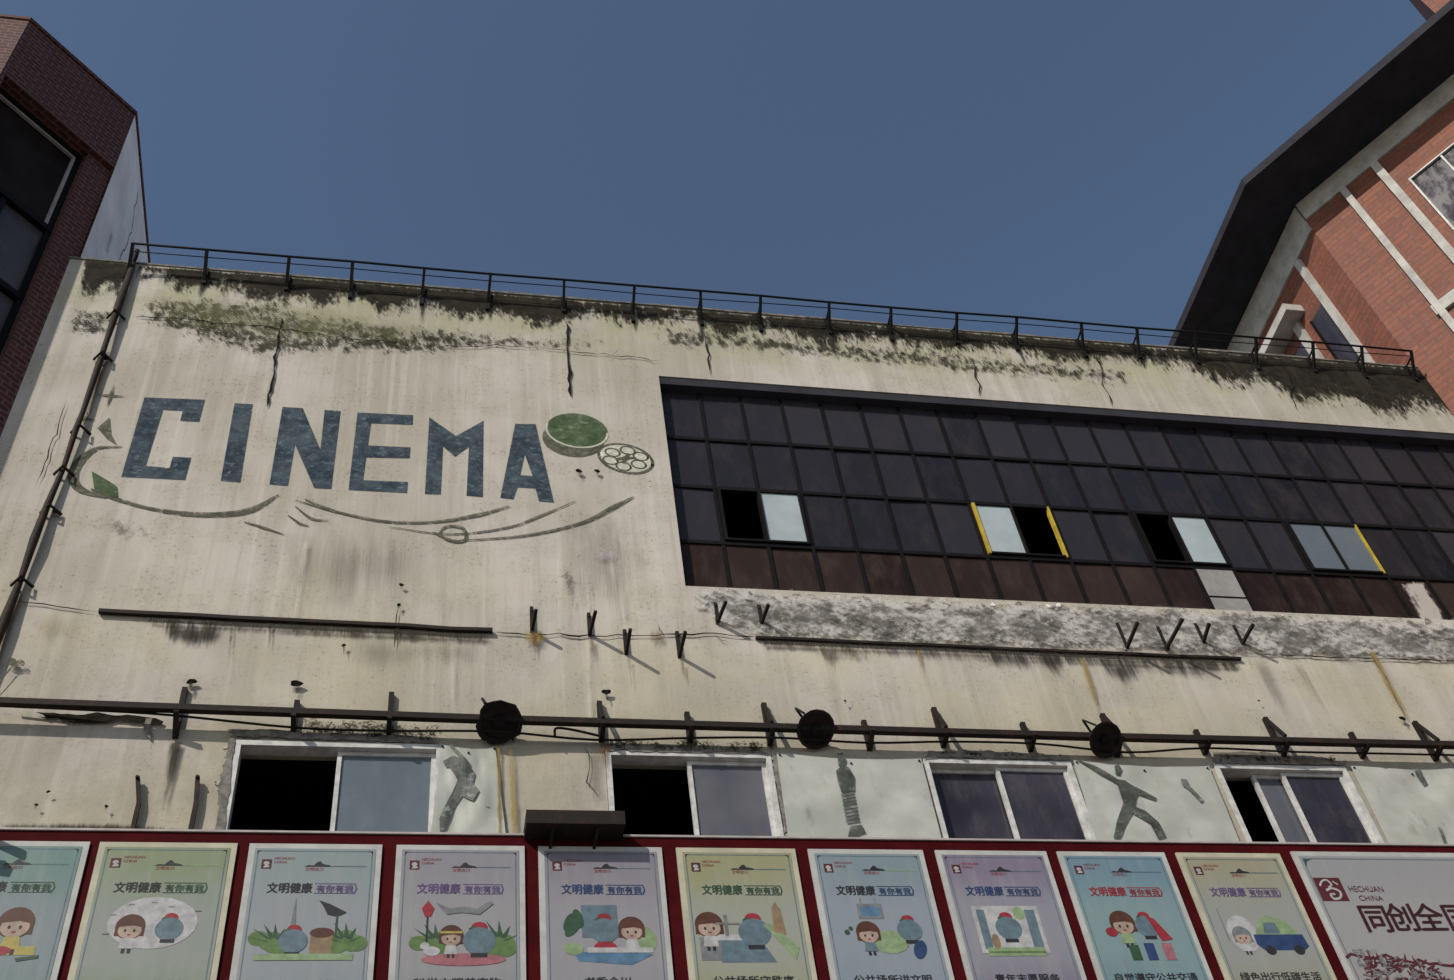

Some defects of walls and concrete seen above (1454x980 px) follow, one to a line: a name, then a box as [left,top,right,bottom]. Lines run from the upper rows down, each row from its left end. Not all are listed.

crack [134,315,399,406]
crack [437,323,658,396]
water stain [71,260,1452,423]
water stain [712,597,1454,678]